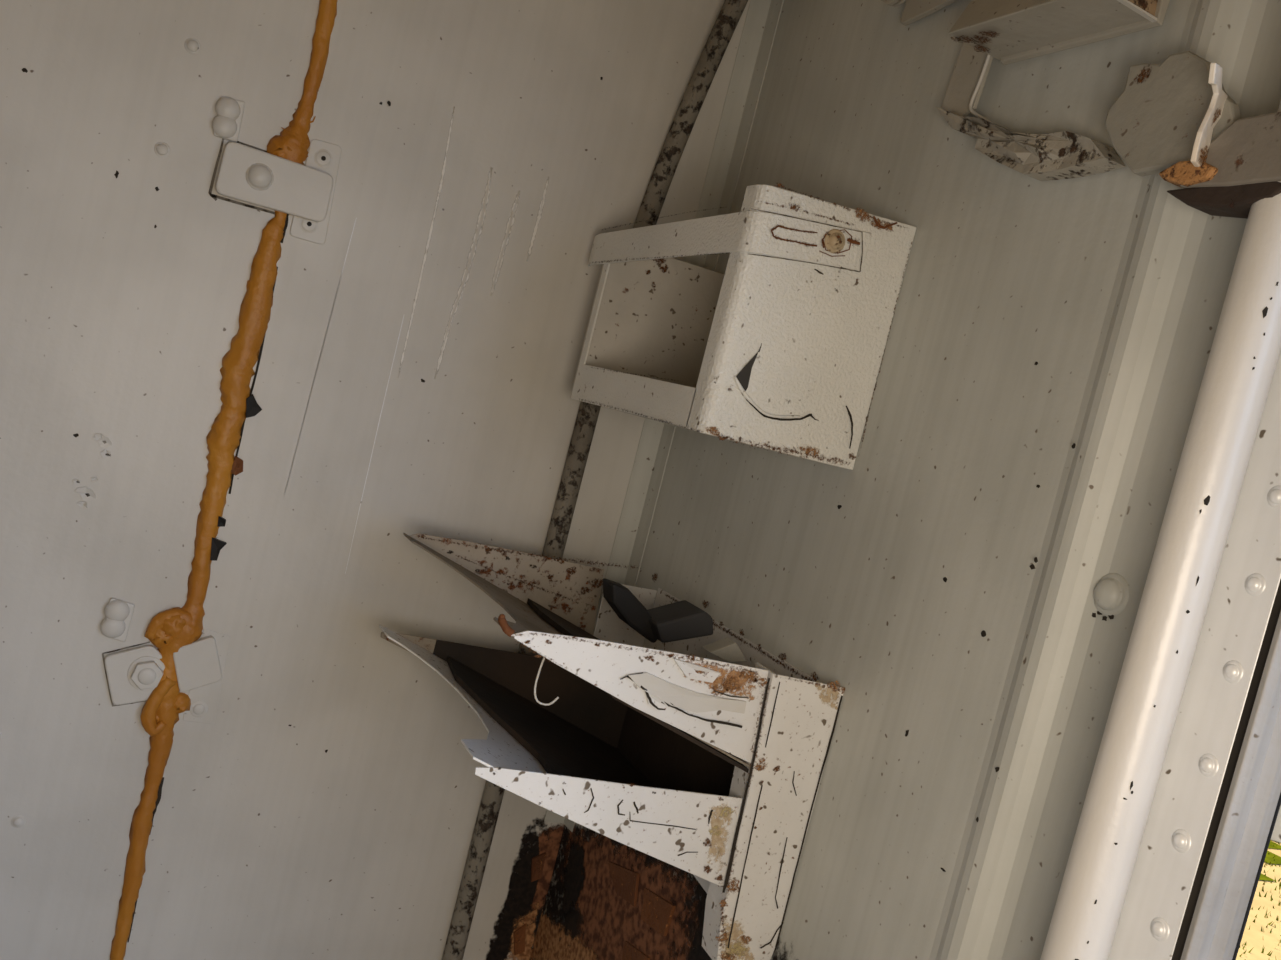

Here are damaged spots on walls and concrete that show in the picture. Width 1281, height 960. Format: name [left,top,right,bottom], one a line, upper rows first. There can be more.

crack [272,214,289,298]
crack [228,333,266,494]
crack [345,316,404,574]
crack [150,777,164,833]